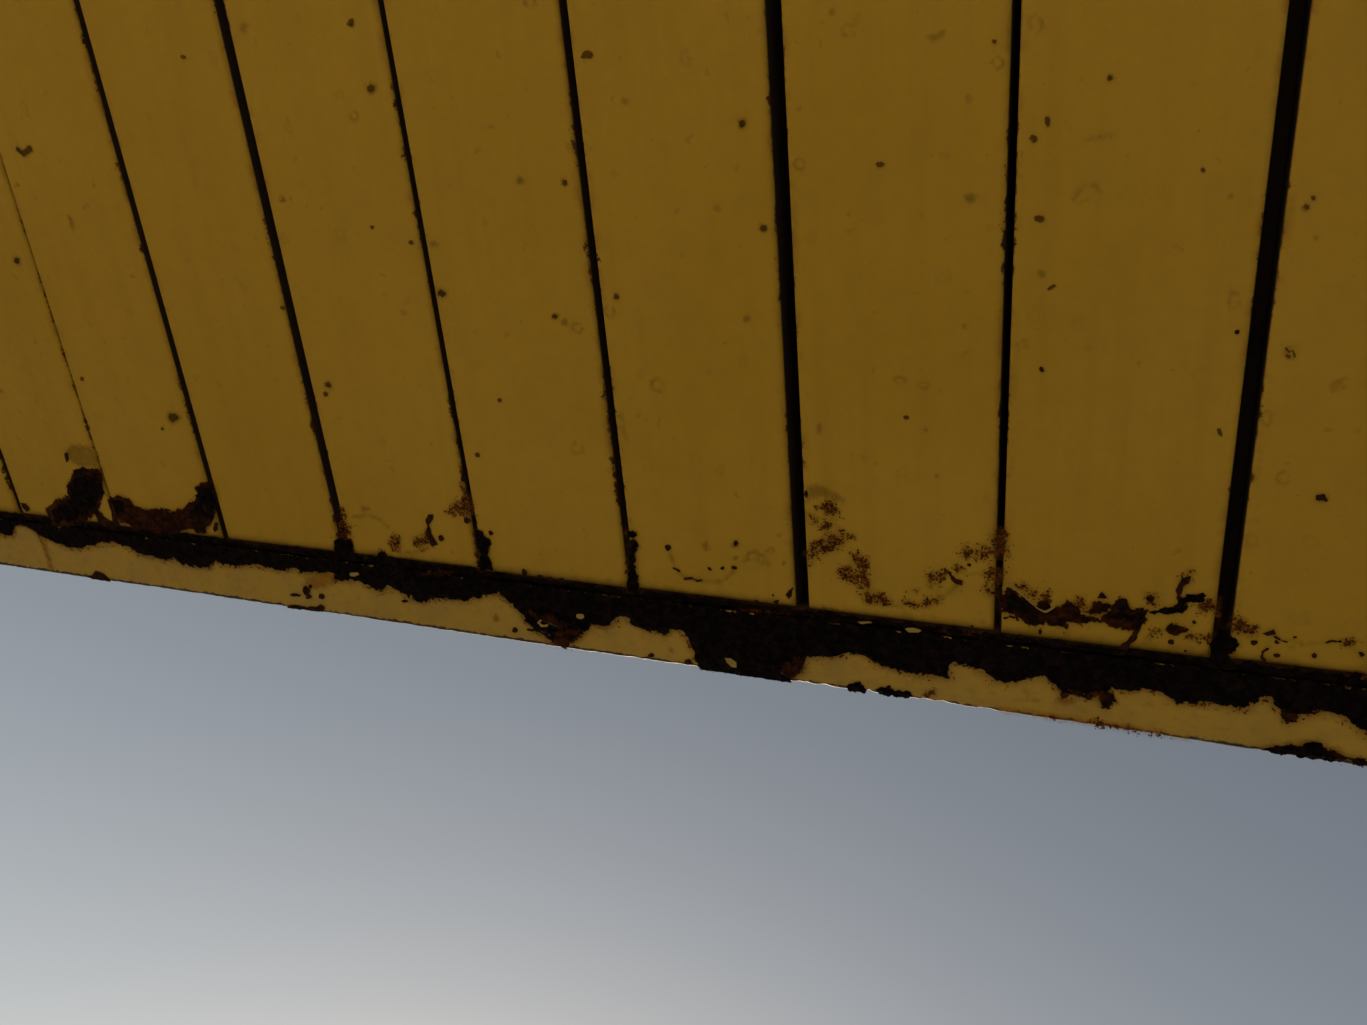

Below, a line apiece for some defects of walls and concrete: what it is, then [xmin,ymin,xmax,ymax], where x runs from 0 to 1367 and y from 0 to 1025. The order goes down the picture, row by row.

corrosion [0,452,1367,740]
corrosion [1263,742,1367,768]